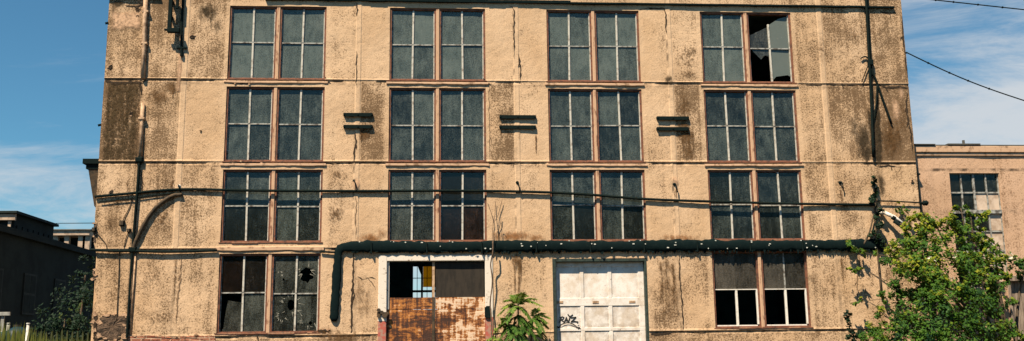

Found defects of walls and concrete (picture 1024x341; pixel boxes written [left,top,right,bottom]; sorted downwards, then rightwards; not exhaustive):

crack [511,6,522,80]
water stain [102,82,175,162]
water stain [678,97,694,159]
water stain [852,97,905,193]
spalling [90,312,216,341]